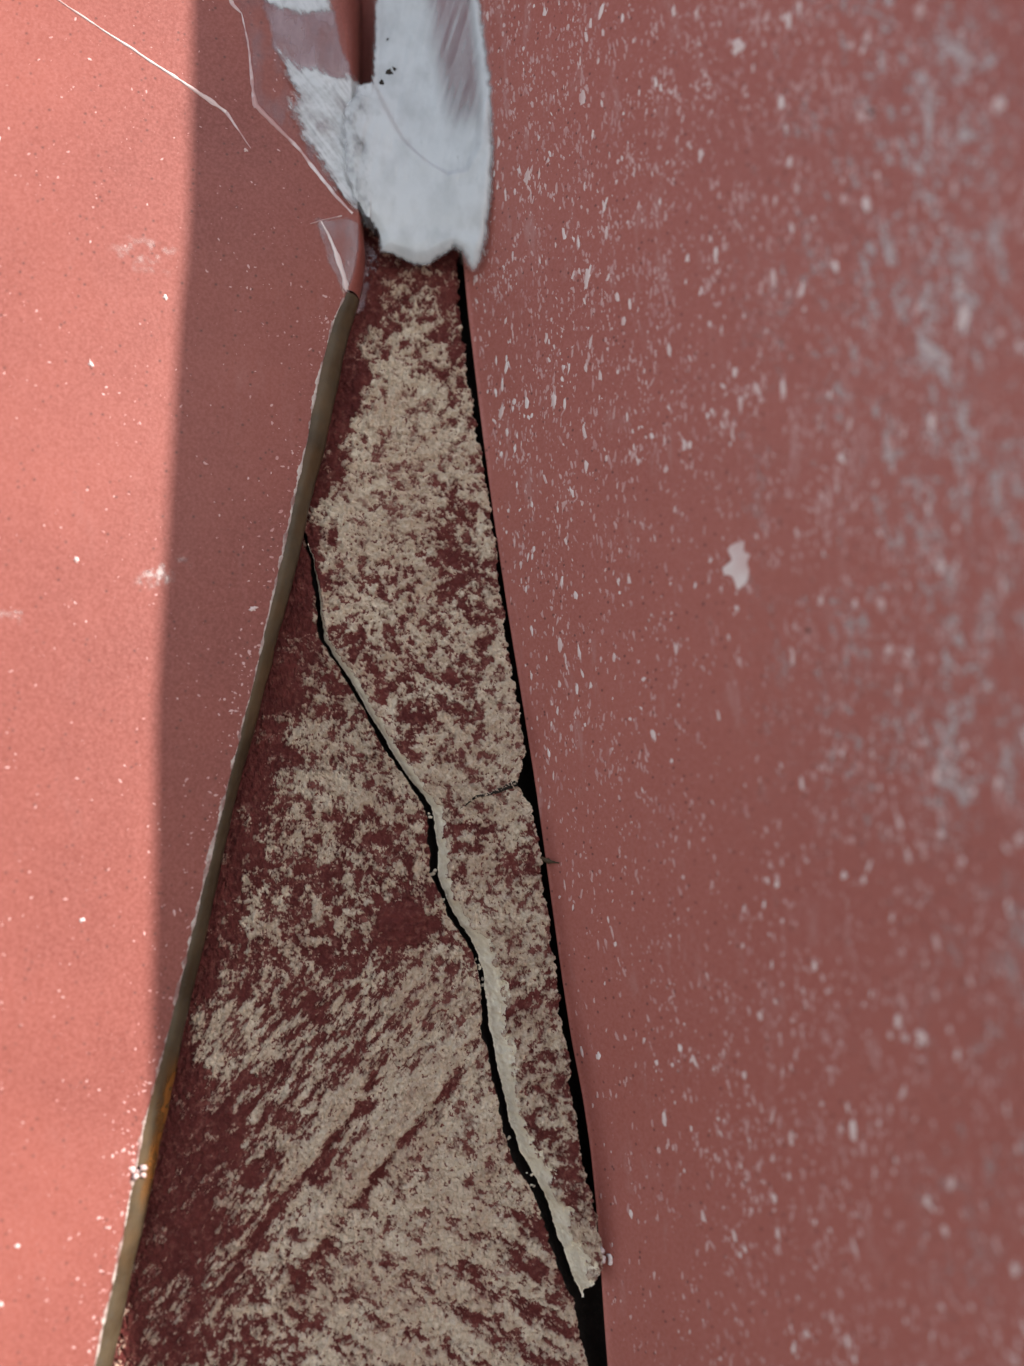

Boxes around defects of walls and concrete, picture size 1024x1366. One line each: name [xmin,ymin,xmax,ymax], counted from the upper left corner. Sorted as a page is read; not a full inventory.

peeling [113,216,603,1366]
crack [304,532,579,1291]